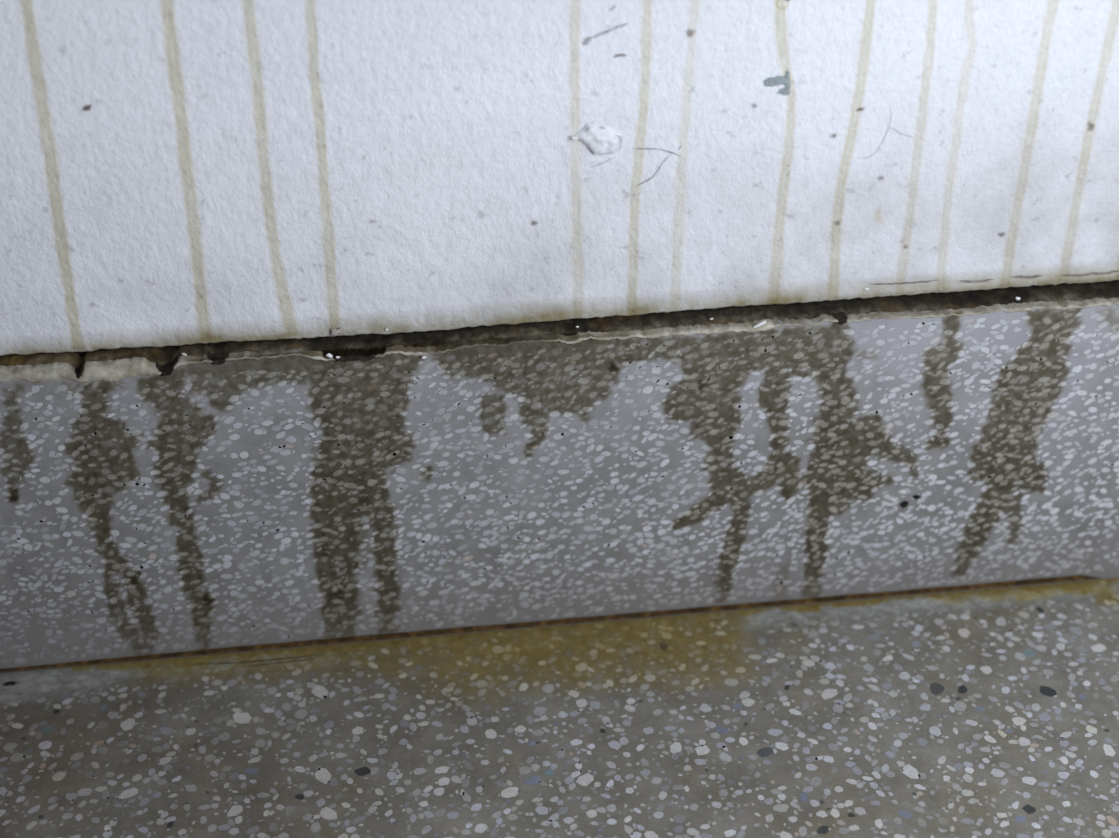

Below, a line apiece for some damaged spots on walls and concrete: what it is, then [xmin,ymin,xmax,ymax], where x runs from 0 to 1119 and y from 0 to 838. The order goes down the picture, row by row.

damp [312,349,401,605]
damp [608,342,641,372]
damp [668,336,752,452]
damp [766,342,881,507]
damp [968,371,1041,553]
damp [171,490,214,620]
damp [744,579,1119,624]
efflorescence [0,667,127,700]